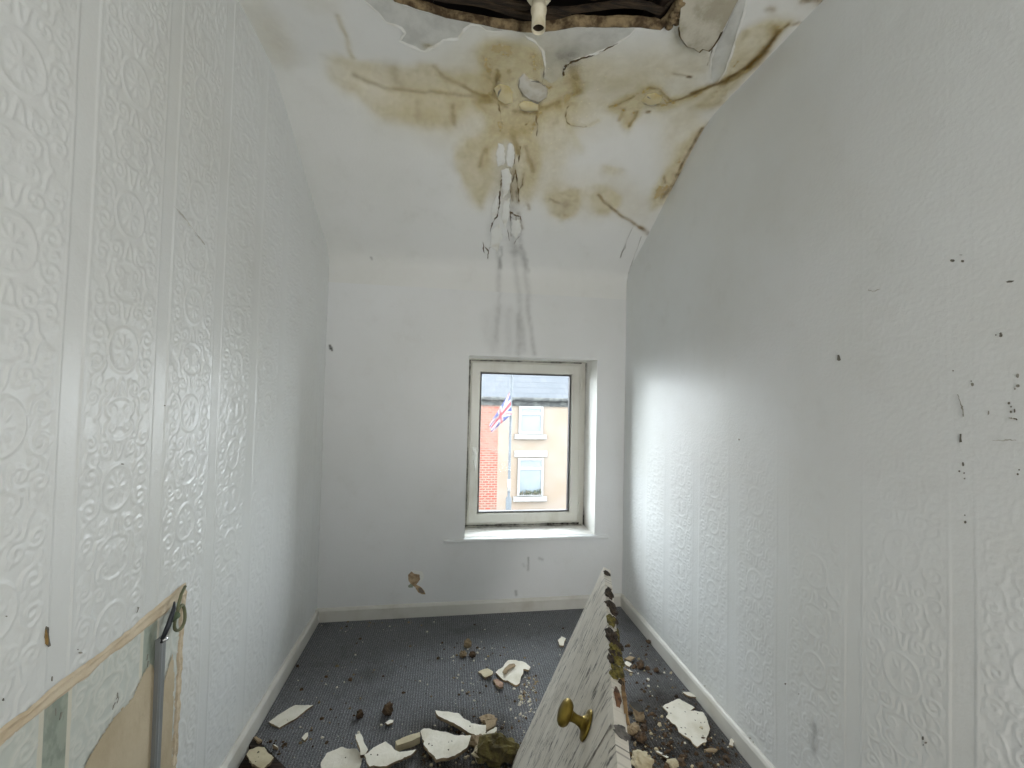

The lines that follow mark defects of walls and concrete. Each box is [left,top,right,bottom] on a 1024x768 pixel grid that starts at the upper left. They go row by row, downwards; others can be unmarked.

peeling [364,0,686,84]
crack [483,104,538,258]
flaking render [408,570,425,594]